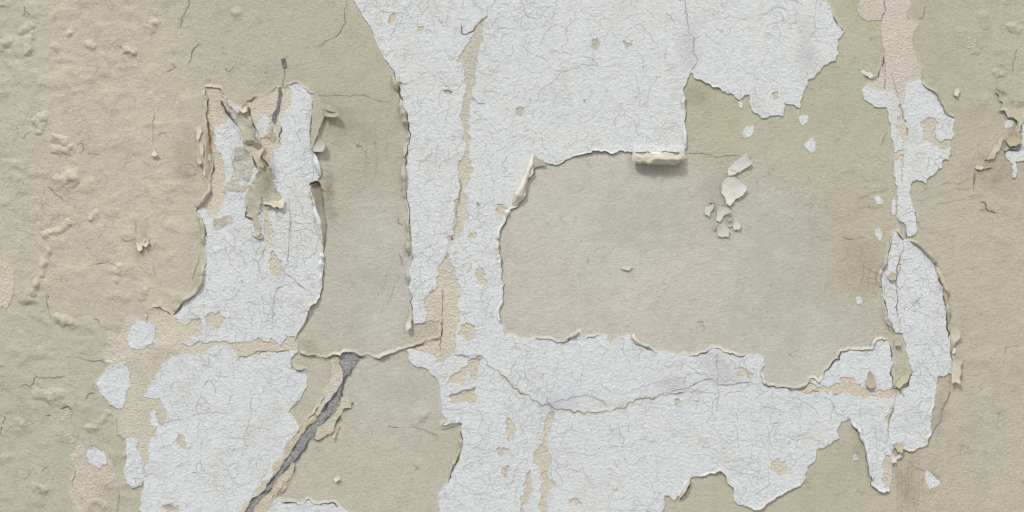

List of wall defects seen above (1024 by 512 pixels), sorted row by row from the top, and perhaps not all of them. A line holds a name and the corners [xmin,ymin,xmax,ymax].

peeling [975,89,1024,178]
peeling [94,80,348,512]
crack [239,353,360,512]
crack [439,291,748,416]
peeling [300,0,962,512]